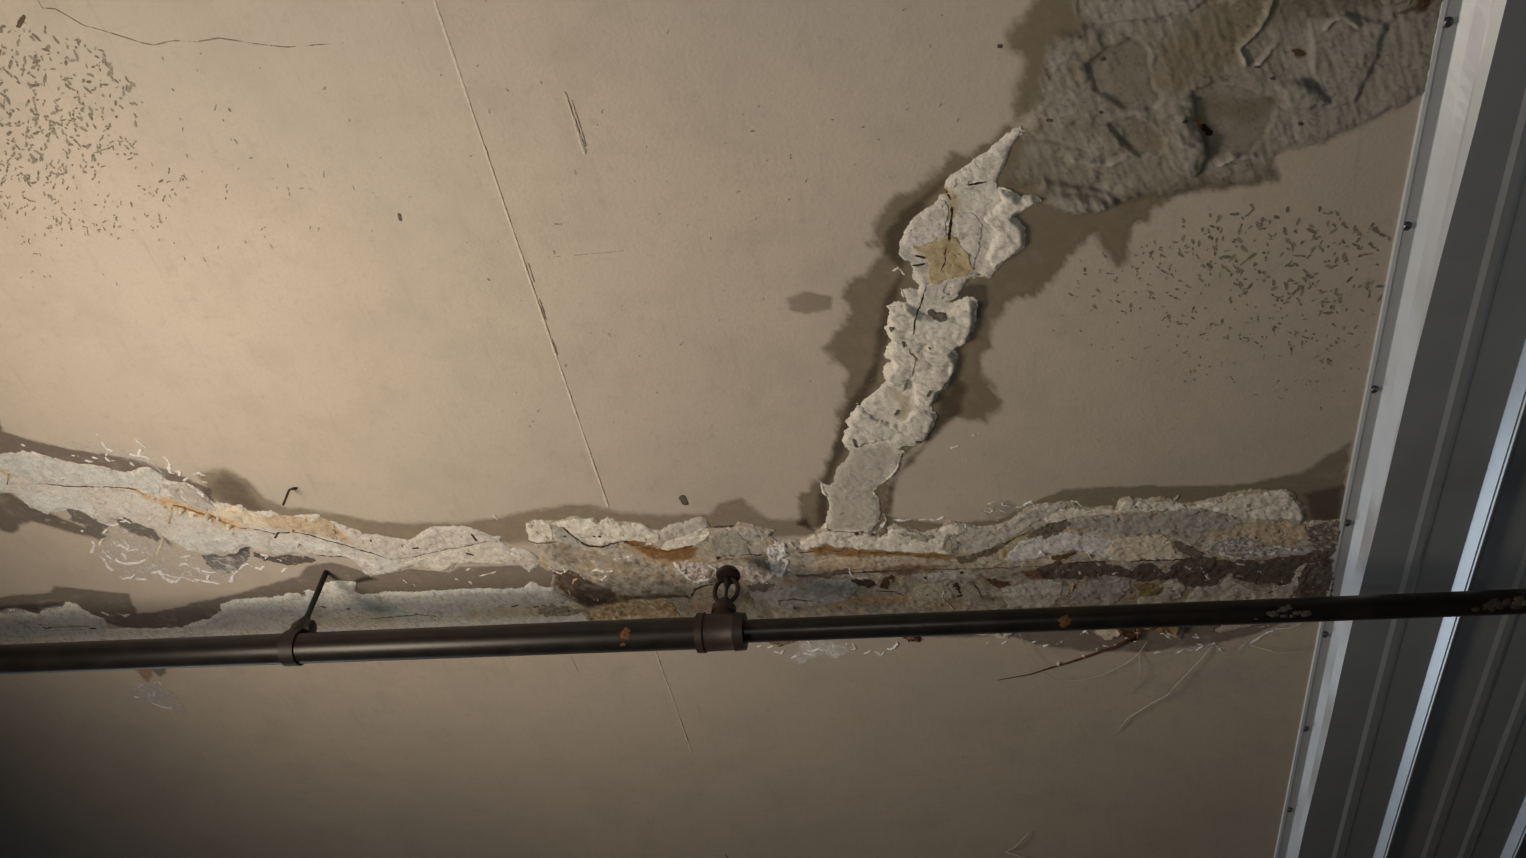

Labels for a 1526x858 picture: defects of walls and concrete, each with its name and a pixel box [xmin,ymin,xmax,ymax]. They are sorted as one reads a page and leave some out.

crack [38,1,326,48]
water stain [0,0,1348,645]
corrosion [627,541,696,560]
corrosion [810,544,949,575]
peeling [1215,624,1255,633]